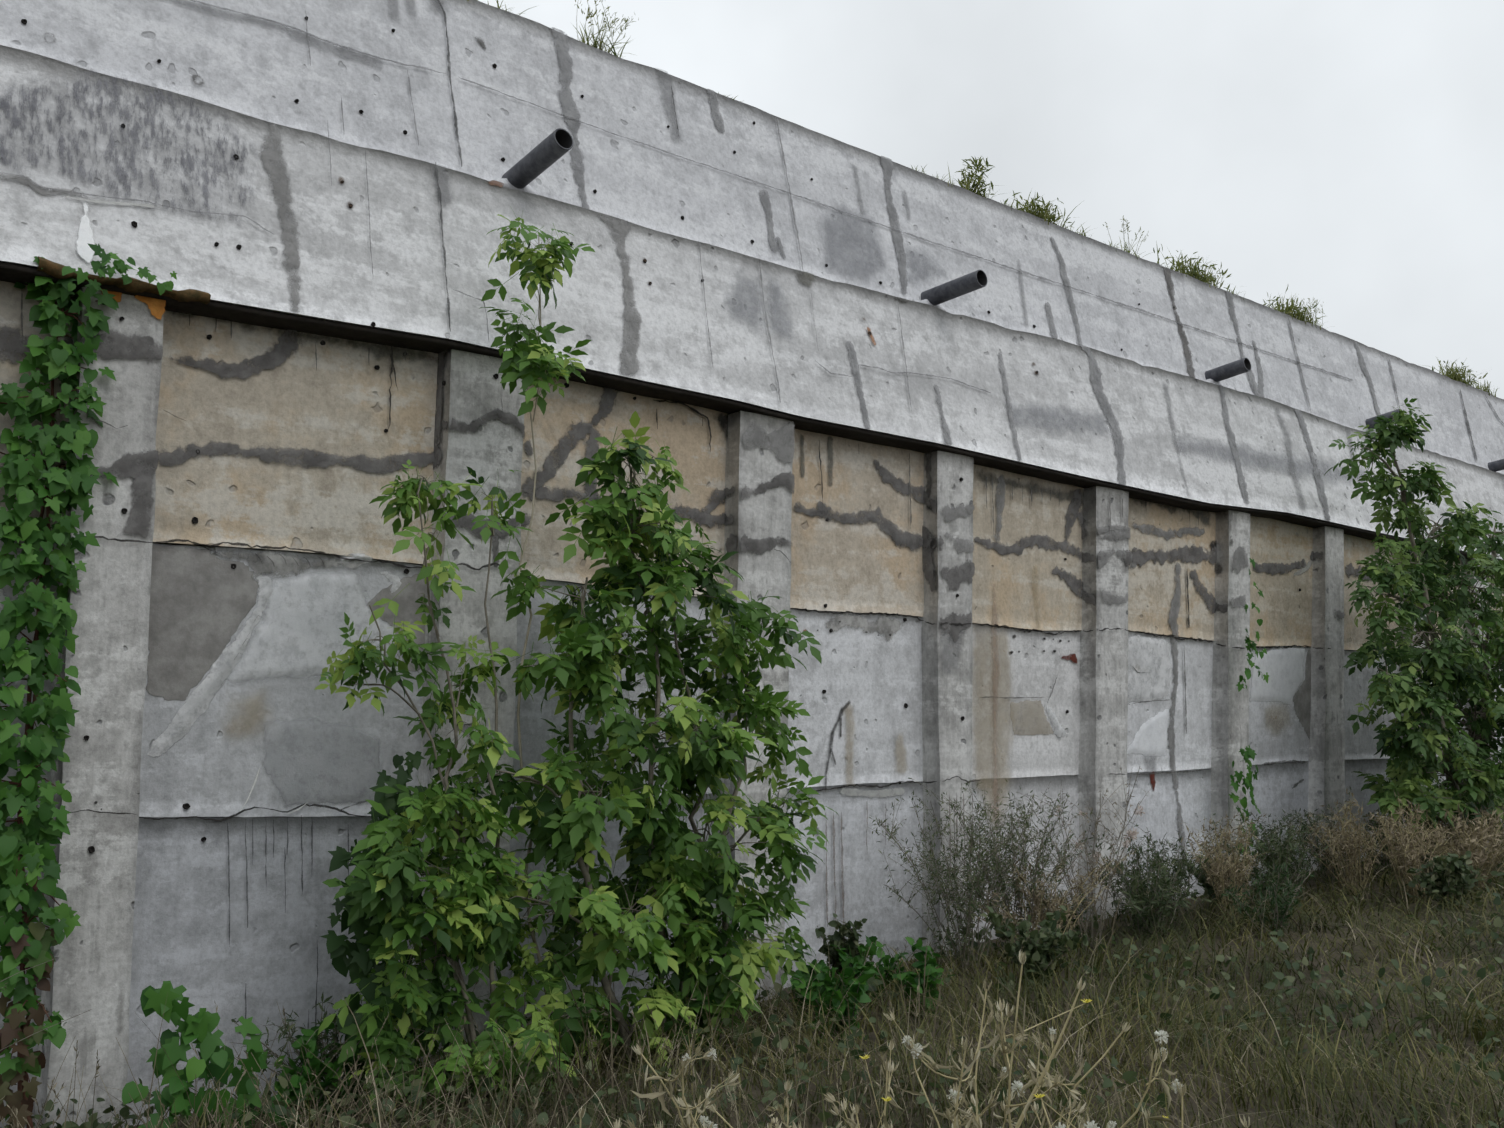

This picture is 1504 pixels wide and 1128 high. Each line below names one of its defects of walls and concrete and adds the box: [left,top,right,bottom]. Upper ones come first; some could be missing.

damp [0,78,250,215]
corrosion [101,289,166,320]
crack [64,0,1400,873]
damp [227,816,313,945]